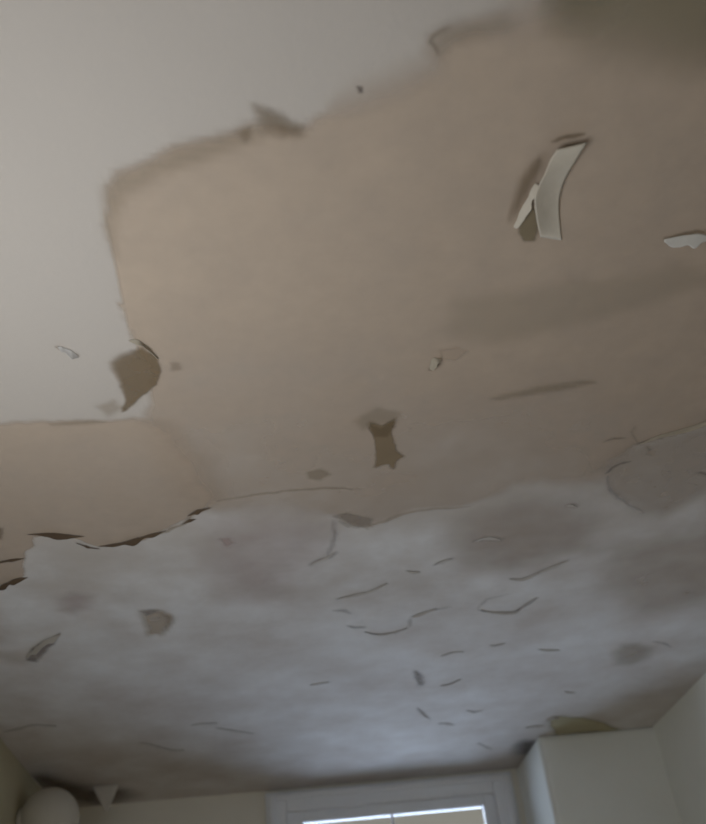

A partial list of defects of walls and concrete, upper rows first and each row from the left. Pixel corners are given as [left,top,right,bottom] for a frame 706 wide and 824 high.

peeling [514,136,587,241]
peeling [664,233,706,249]
peeling [369,420,403,468]
peeling [0,420,211,590]
peeling [337,514,370,529]
peeling [26,634,61,661]
spalling [526,716,617,735]